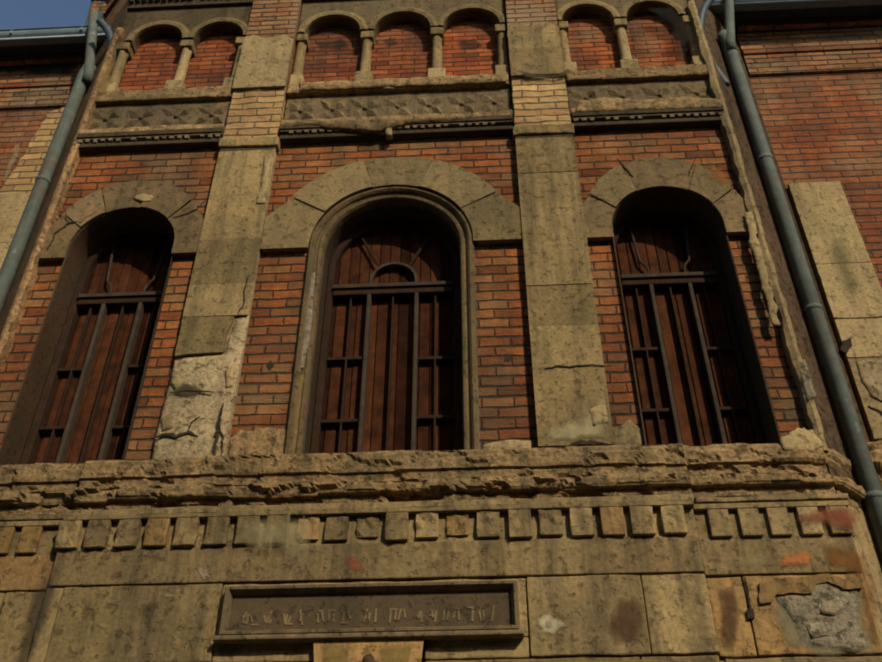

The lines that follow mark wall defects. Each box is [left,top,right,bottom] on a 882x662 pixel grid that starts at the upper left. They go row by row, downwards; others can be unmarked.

crack [155,403,224,456]
flaking render [550,401,644,445]
spalling [781,553,810,565]
damp [613,602,640,638]
spalling [758,573,871,653]